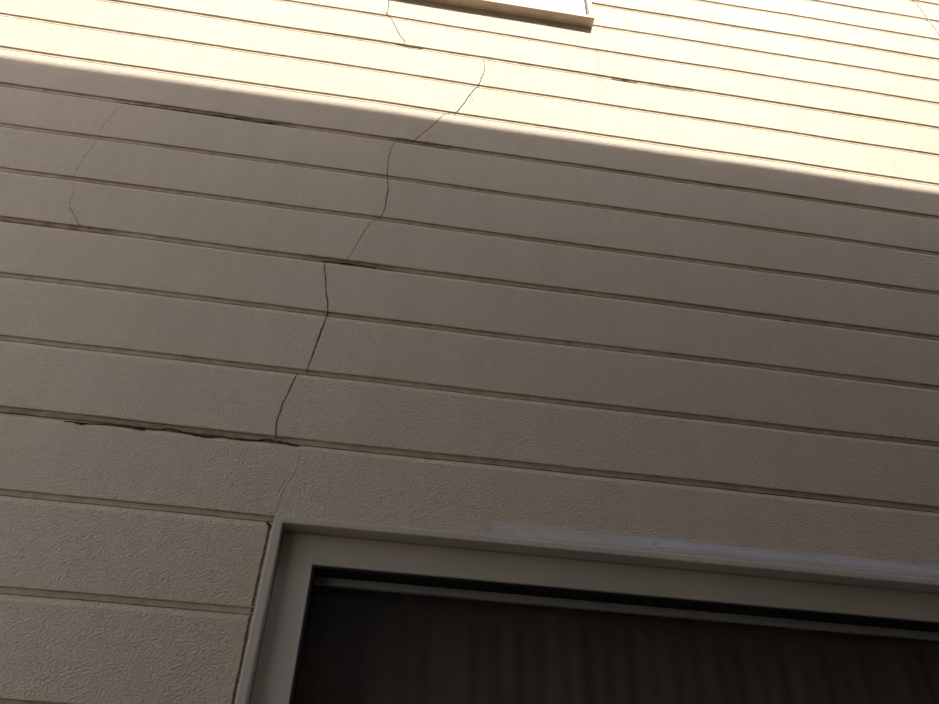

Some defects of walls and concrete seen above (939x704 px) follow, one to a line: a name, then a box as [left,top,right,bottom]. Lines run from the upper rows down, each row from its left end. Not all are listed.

crack [348,59,485,258]
crack [275,264,328,440]